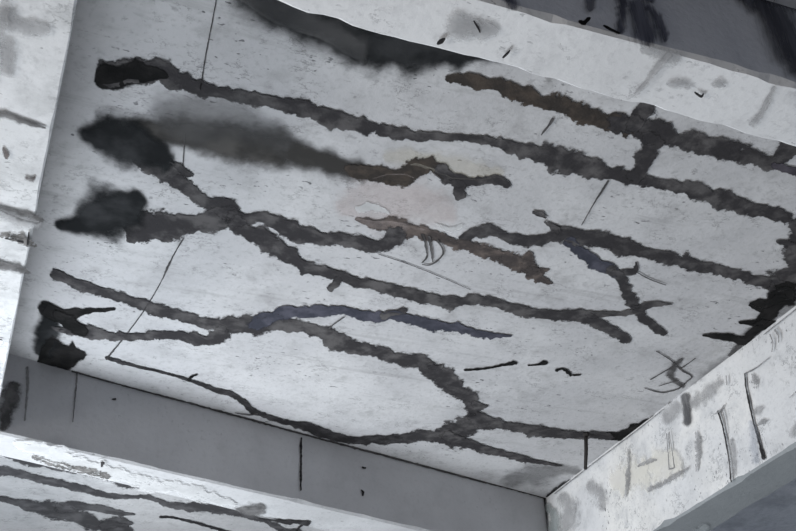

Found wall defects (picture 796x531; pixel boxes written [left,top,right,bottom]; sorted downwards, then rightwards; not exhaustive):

damp [0,11,49,77]
damp [238,0,490,74]
damp [578,0,596,25]
damp [603,0,680,95]
damp [742,0,796,74]
crack [0,111,46,129]
damp [132,117,512,201]
crack [94,1,796,345]
crack [37,116,643,523]
crack [744,358,769,460]
crack [554,409,664,494]
crack [0,466,303,531]